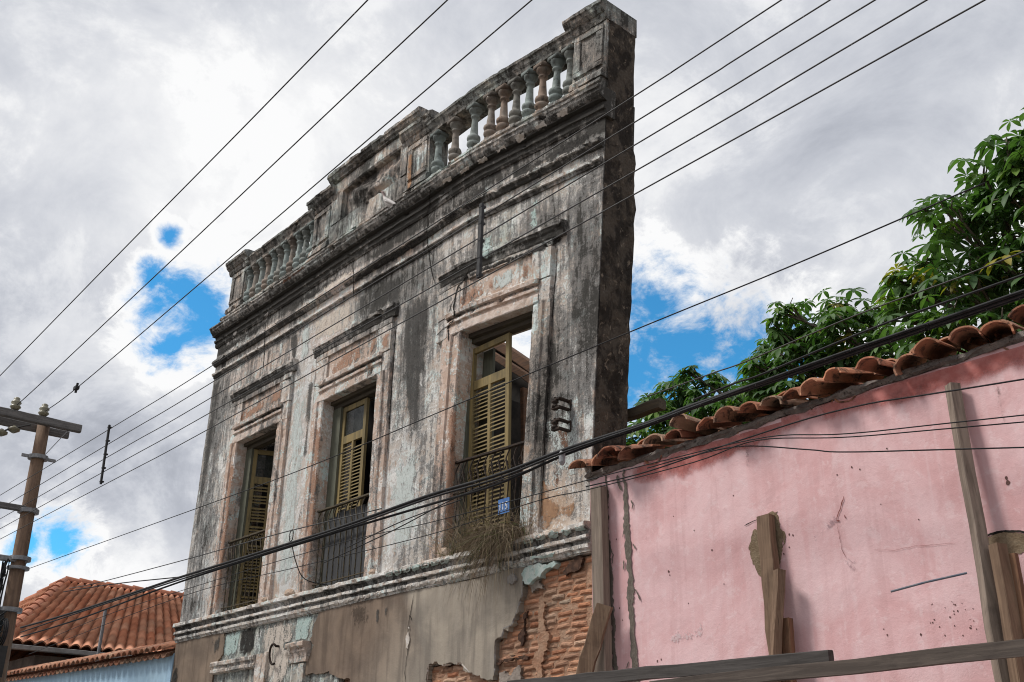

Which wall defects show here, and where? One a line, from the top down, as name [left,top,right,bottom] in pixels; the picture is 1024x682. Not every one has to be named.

water stain [442,186,487,226]
flaking render [460,264,528,307]
water stain [312,218,567,439]
peeling [277,401,321,584]
flaking render [748,529,761,577]
flaking render [769,511,794,565]
flaking render [988,532,1024,554]
peeling [224,631,240,656]
peeling [263,616,312,682]
flaking render [427,552,593,682]